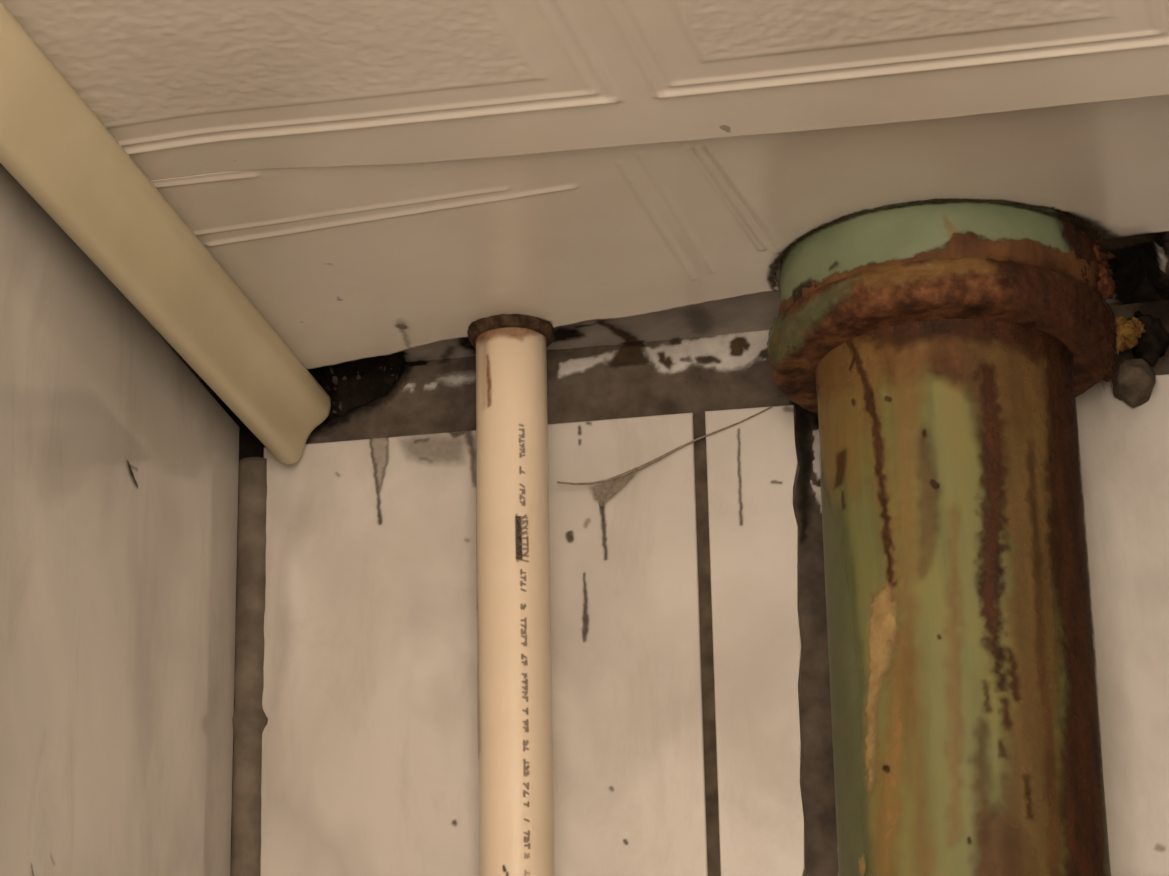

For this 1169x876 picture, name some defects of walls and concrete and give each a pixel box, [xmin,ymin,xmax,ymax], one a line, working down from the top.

rust [777,210,1116,322]
water stain [308,366,326,385]
water stain [459,337,476,355]
water stain [554,319,770,369]
water stain [216,394,265,460]
water stain [370,437,388,524]
water stain [447,427,475,481]
water stain [792,402,820,540]
rust [815,318,1106,876]